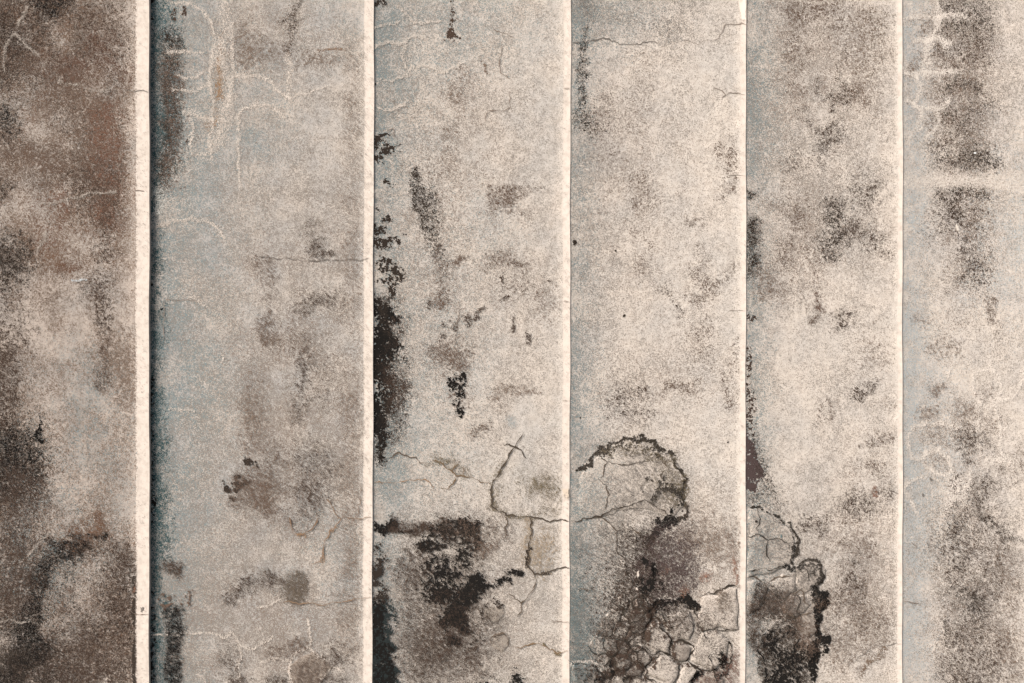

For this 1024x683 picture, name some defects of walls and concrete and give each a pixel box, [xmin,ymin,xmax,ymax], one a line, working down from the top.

mould [374,133,402,165]
damp [373,165,471,467]
damp [0,414,66,517]
damp [0,531,108,683]
damp [372,461,561,683]
crack [289,435,816,683]
spalling [624,509,715,615]